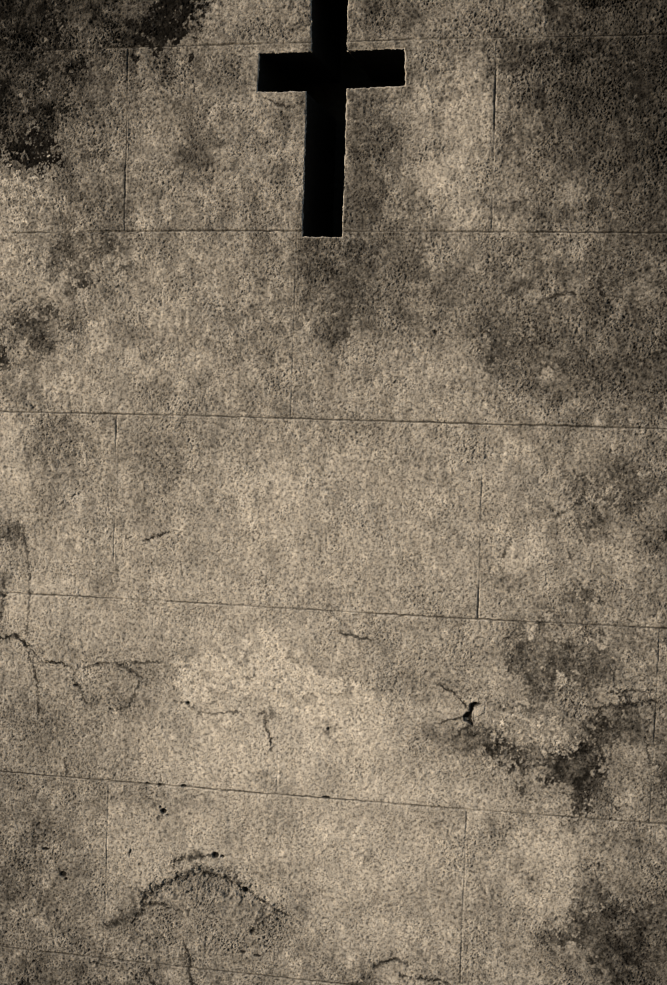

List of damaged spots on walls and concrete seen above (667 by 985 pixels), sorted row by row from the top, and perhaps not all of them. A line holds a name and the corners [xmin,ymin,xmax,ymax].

crack [0,527,170,716]
spalling [437,684,485,737]